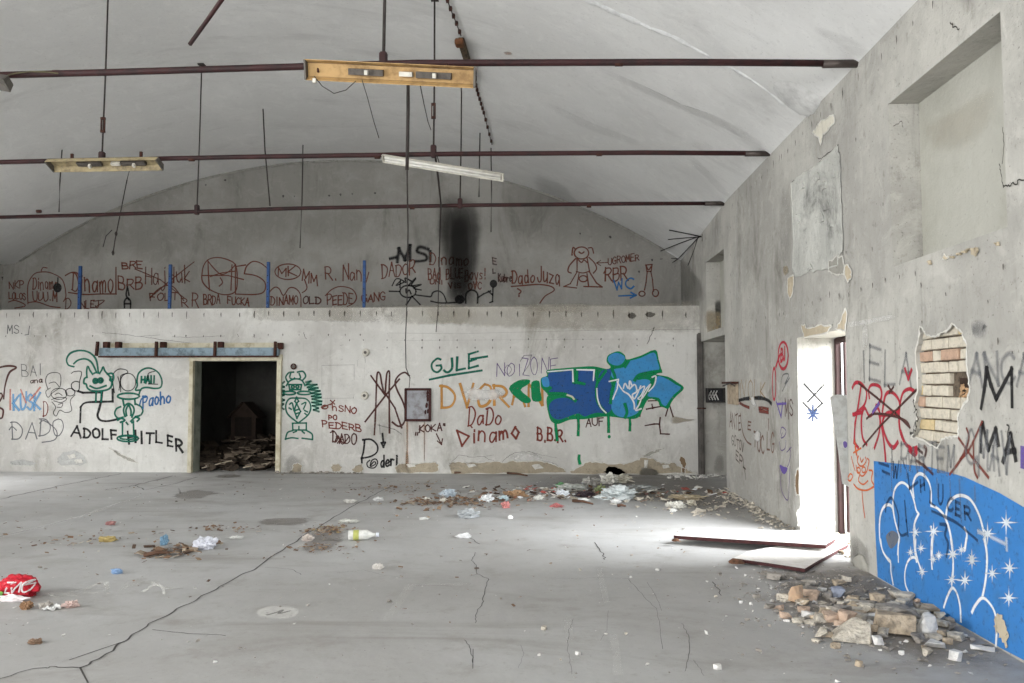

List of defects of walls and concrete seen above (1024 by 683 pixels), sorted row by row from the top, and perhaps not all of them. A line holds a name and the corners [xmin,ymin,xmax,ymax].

peeling [787,114,852,301]
crack [999,129,1024,188]
flaking render [910,323,970,449]
flaking render [394,447,697,475]
crack [0,488,387,683]
flaking render [994,613,1009,648]